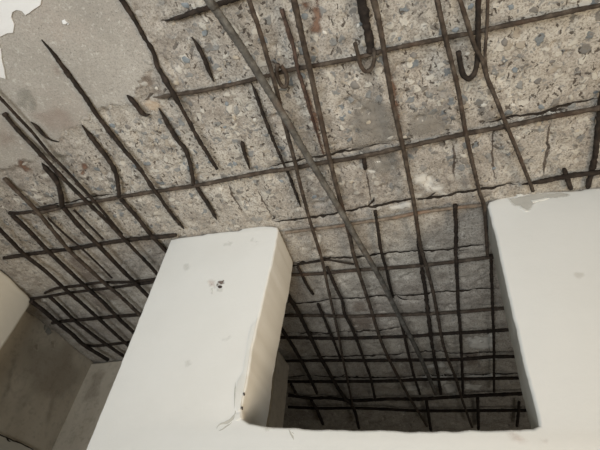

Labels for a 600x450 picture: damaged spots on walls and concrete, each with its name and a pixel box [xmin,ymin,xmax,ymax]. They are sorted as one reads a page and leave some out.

corrosion [303,0,321,32]
spalling [119,170,320,265]
crack [272,183,518,222]
spalling [62,199,156,298]
spalling [126,233,177,272]
crack [295,244,490,264]
spalling [50,243,148,330]
crack [286,288,490,304]
spalling [453,203,531,431]
spalling [278,260,480,432]
crack [316,349,493,357]
crack [292,372,518,380]